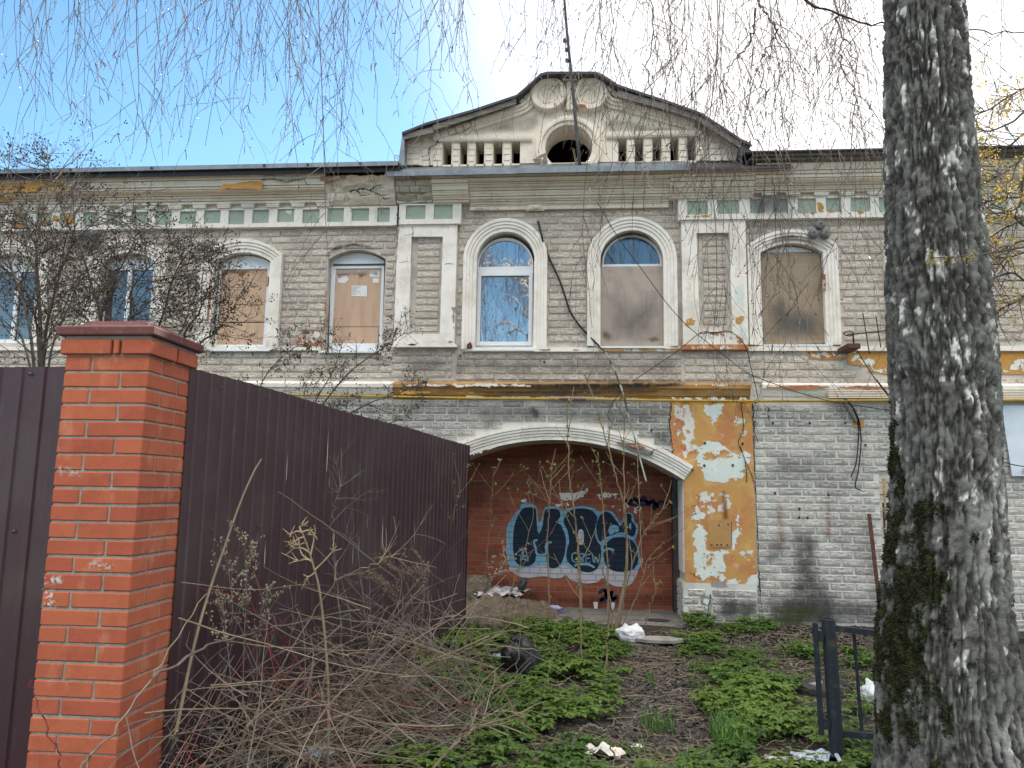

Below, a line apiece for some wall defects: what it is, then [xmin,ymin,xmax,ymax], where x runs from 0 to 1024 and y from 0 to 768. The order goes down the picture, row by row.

peeling [220,174,306,190]
crack [348,184,413,263]
peeling [400,383,638,399]
peeling [766,351,888,395]
peeling [999,351,1024,375]
peeling [672,384,759,614]
damp [773,538,864,622]